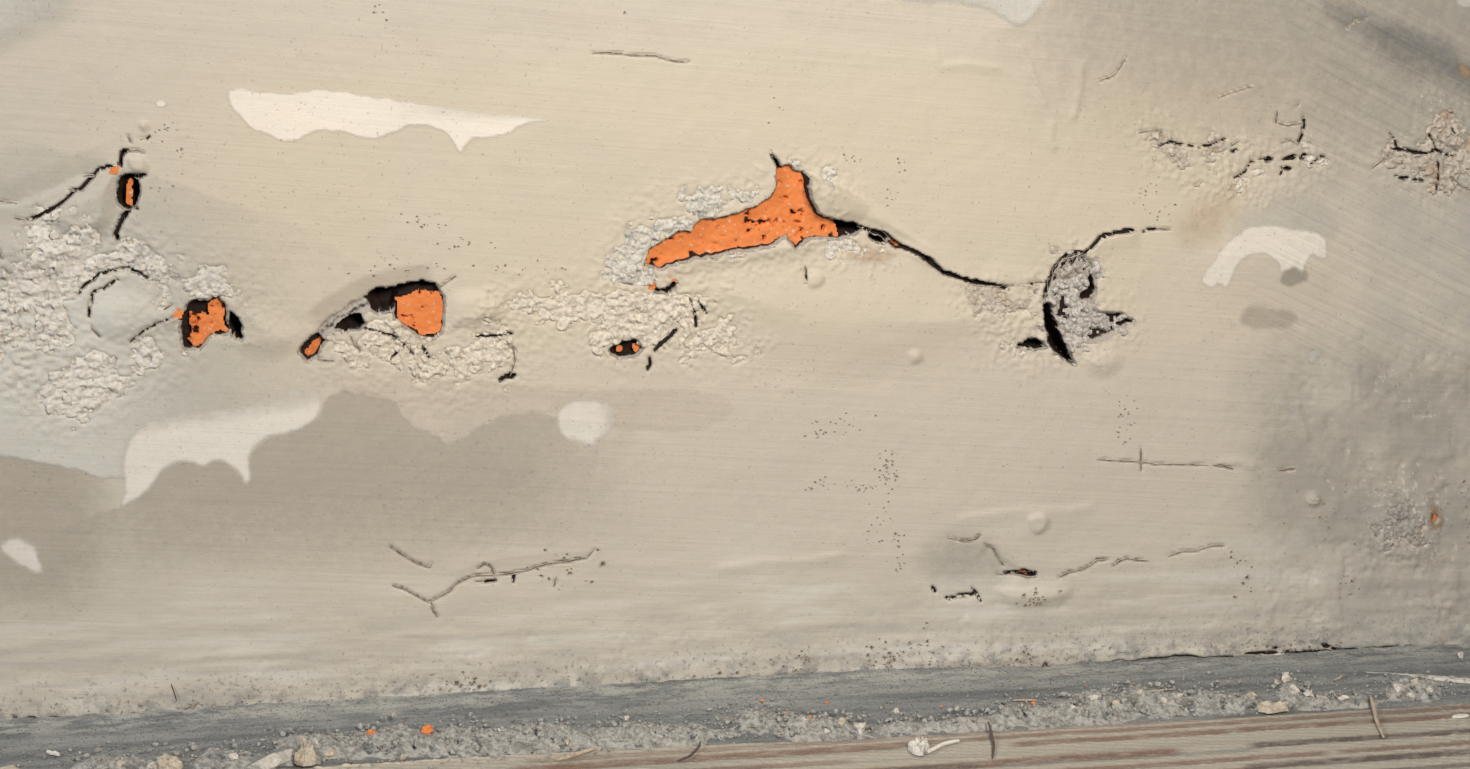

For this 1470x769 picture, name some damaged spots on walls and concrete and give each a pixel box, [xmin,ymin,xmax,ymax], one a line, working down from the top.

crack [1139,86,1326,178]
crack [1372,128,1470,191]
crack [0,135,175,343]
flaking render [0,203,248,430]
flaking render [297,150,904,387]
crack [857,225,1171,297]
flaking render [965,244,1136,367]
water stain [138,391,529,516]
water stain [0,457,79,584]
crack [389,546,595,618]
crack [931,534,1225,602]